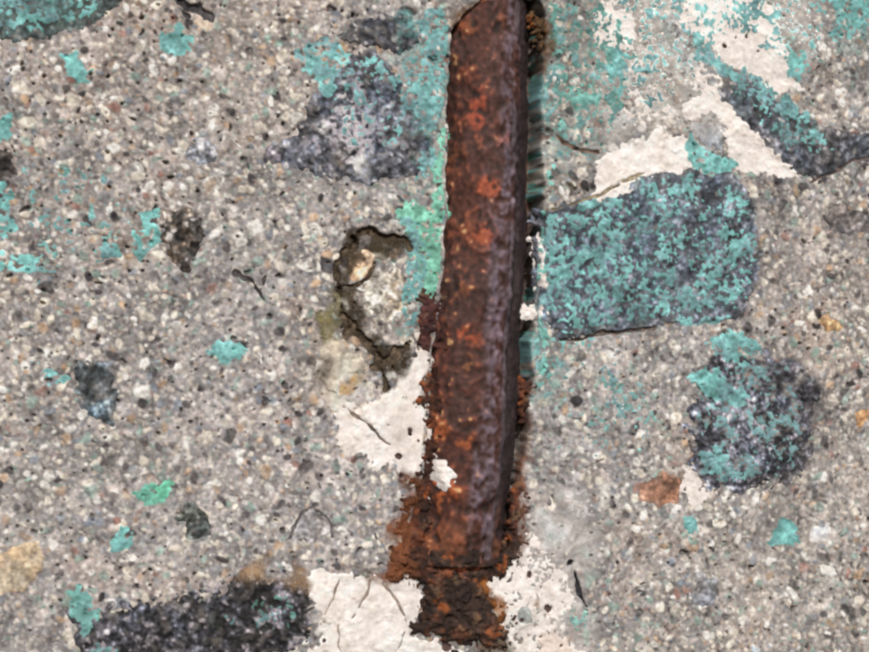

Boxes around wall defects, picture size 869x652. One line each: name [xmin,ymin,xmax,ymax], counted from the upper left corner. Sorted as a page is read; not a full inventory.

corrosion [526,11,556,70]
spalling [294,0,869,579]
peeling [206,339,248,364]
corrosion [385,287,538,652]
peeling [90,642,118,652]
peeling [251,596,296,630]
peeling [299,568,464,652]
peeling [486,531,588,652]